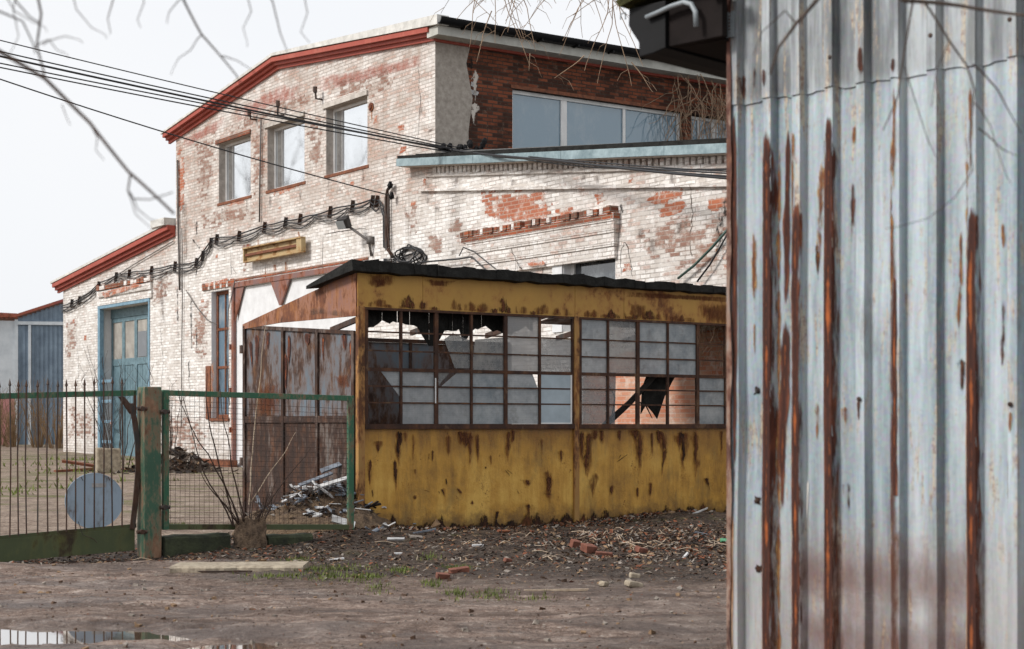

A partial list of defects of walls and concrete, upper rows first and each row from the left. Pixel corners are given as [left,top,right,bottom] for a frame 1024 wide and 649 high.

peeling [471,70,479,122]
flaking render [480,190,573,222]
flaking render [639,188,726,275]
rust [453,298,568,315]
rust [336,334,351,387]
rust [762,132,803,649]
rust [823,118,850,649]
rust [394,431,414,483]
rust [446,432,492,469]
rust [580,431,604,493]
rust [618,430,710,490]
rust [956,210,984,649]